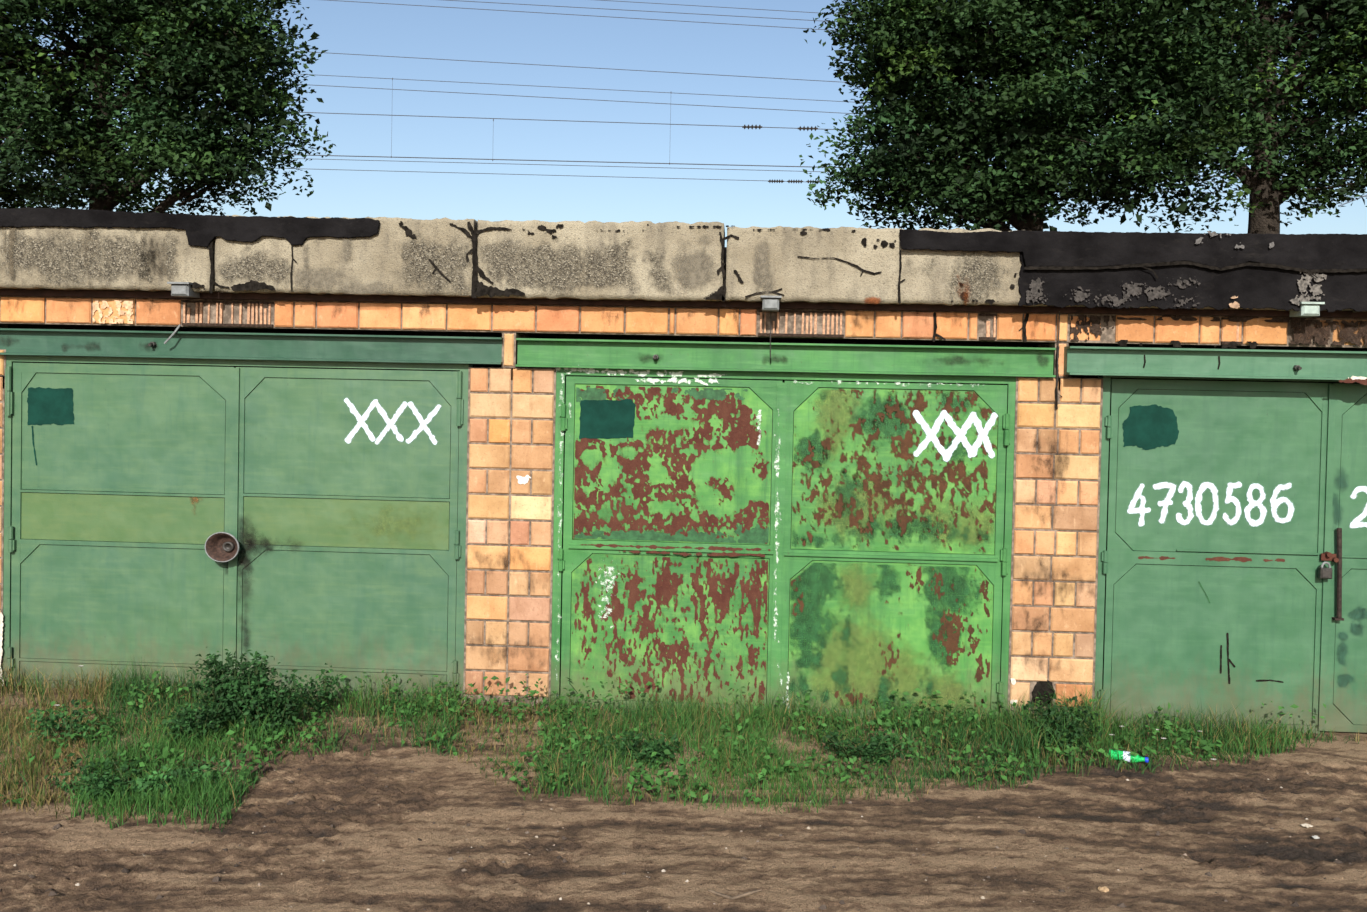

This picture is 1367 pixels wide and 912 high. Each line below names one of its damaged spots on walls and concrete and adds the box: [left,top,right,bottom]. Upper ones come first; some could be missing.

crack [429,221,512,298]
crack [717,232,784,302]
crack [797,250,905,304]
crack [933,312,946,342]
spalling [951,282,999,340]
peeling [1010,273,1046,304]
spalling [1065,278,1367,349]
corrosion [572,386,770,705]
corrosion [791,388,998,707]
leakage [1338,608,1367,686]